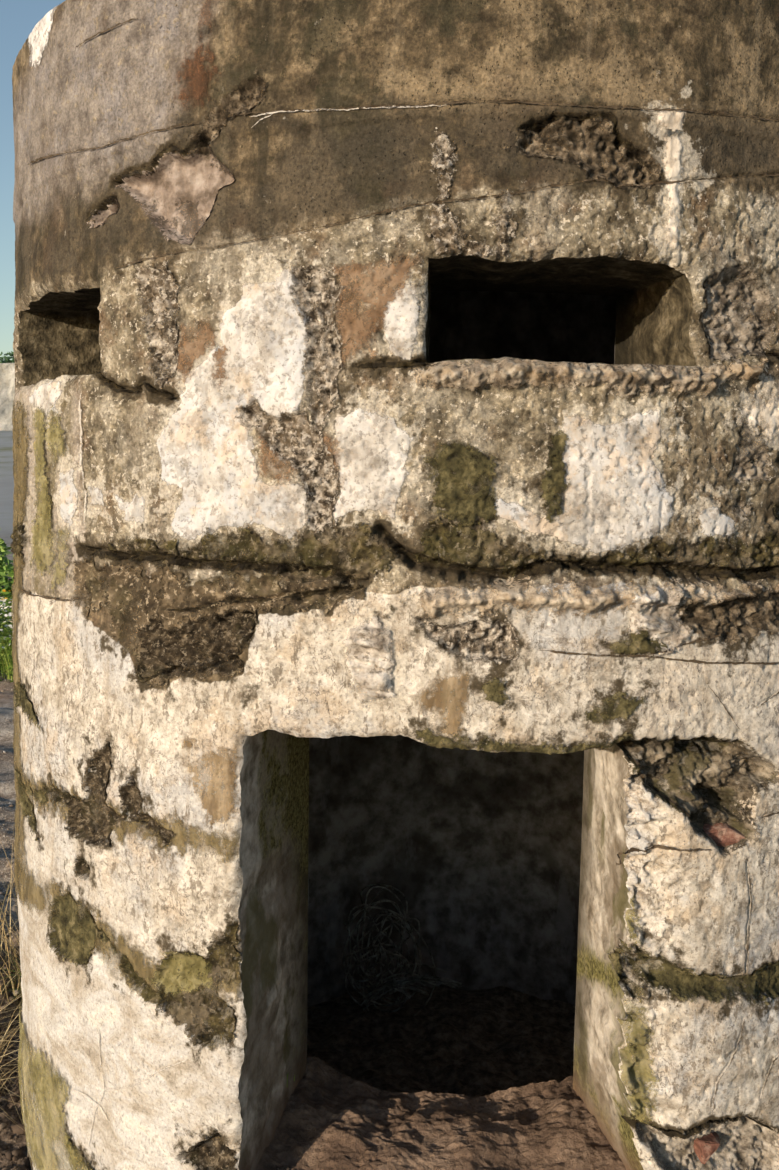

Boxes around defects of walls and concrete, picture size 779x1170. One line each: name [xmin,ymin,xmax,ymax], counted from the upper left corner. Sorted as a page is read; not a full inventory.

spalling [86,69,267,244]
crack [28,99,779,268]
spalling [503,110,662,194]
peeling [383,283,419,360]
spalling [699,265,779,364]
peeling [29,379,62,416]
peeling [72,260,413,687]
peeling [414,410,779,665]
spalling [343,616,395,700]
spalling [615,736,779,856]
crack [621,1019,777,1139]
spalling [631,1115,779,1170]